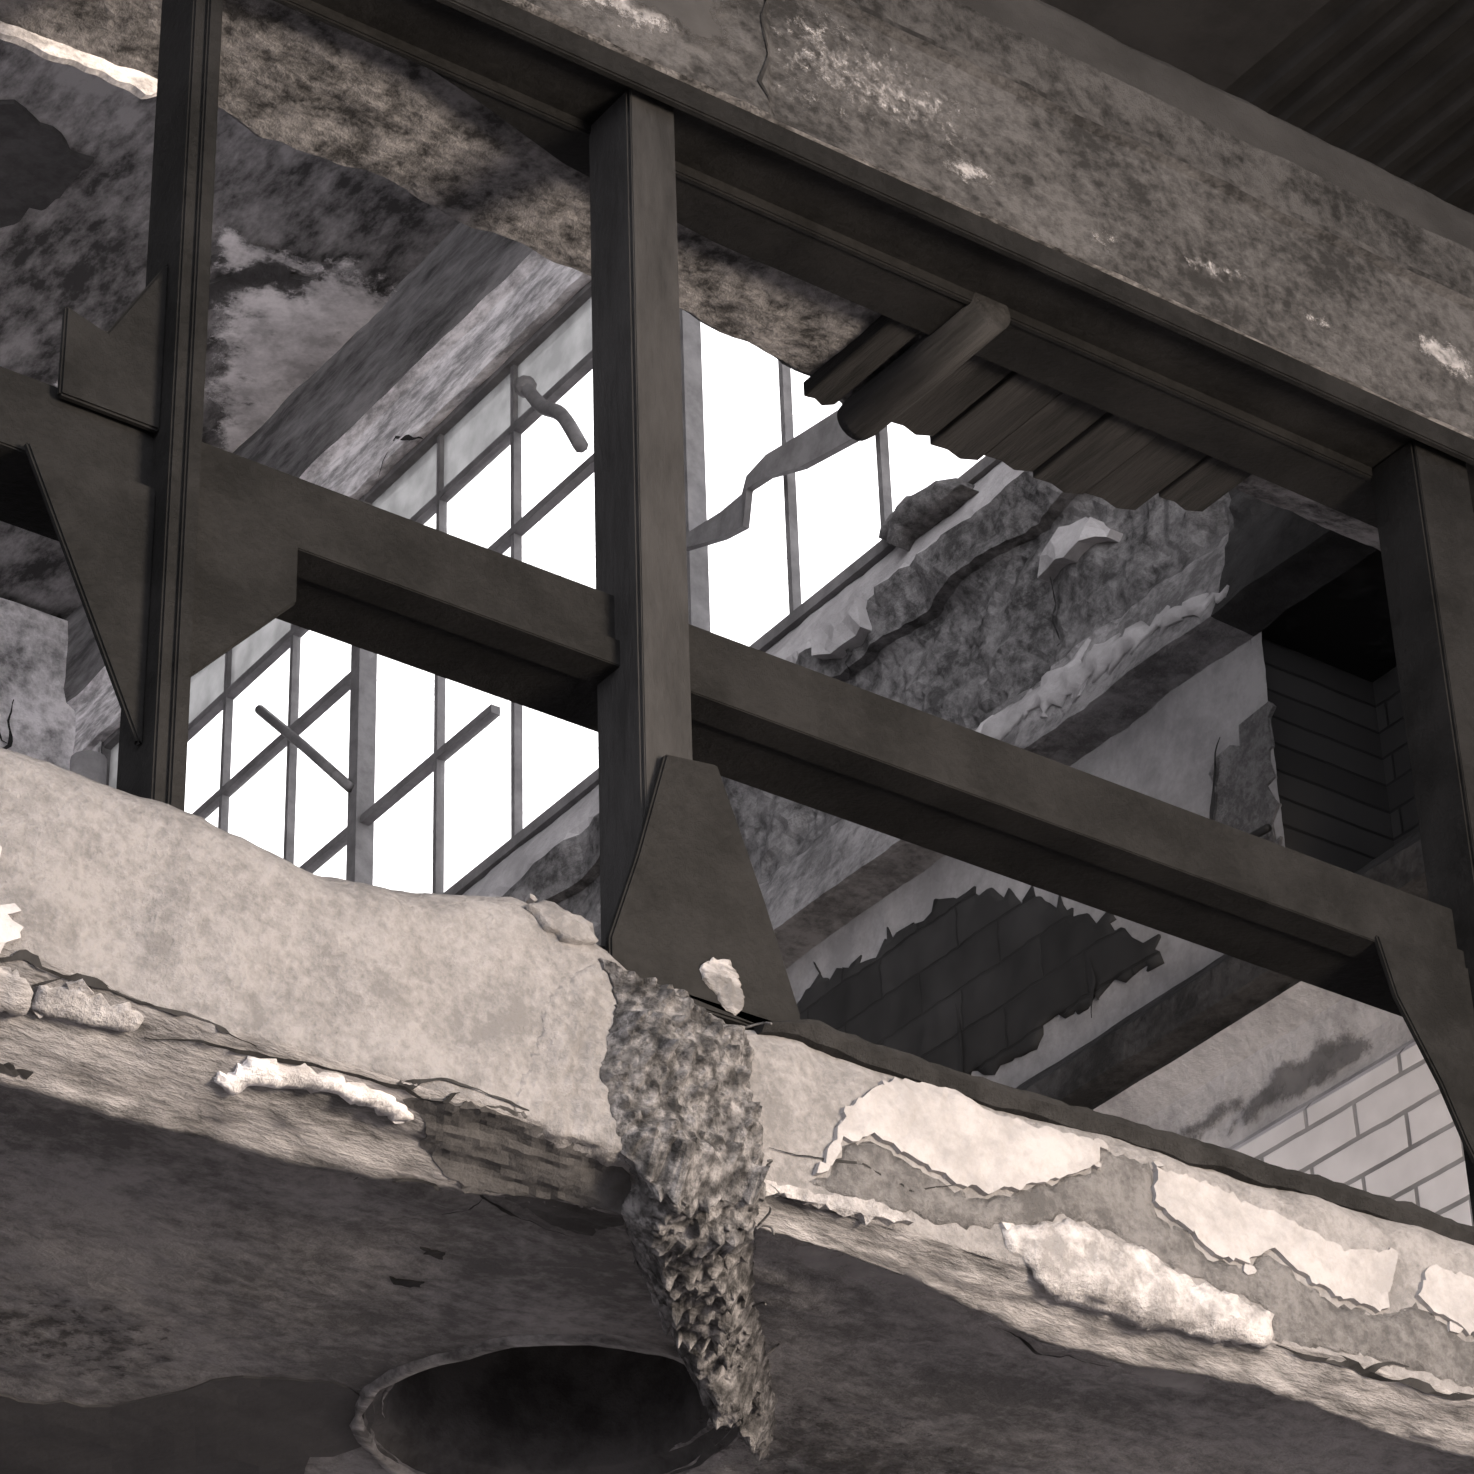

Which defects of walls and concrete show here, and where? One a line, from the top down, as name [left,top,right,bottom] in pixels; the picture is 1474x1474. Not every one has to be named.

flaking render [0,21,157,99]
flaking render [0,99,94,228]
spalling [878,478,979,551]
spalling [1037,517,1123,582]
spalling [811,597,872,660]
spalling [976,585,1229,740]
crack [0,699,14,749]
spalling [0,903,144,1032]
flaking render [213,1056,632,1236]
flaking render [764,1077,1474,1388]
flaking render [0,1375,375,1474]